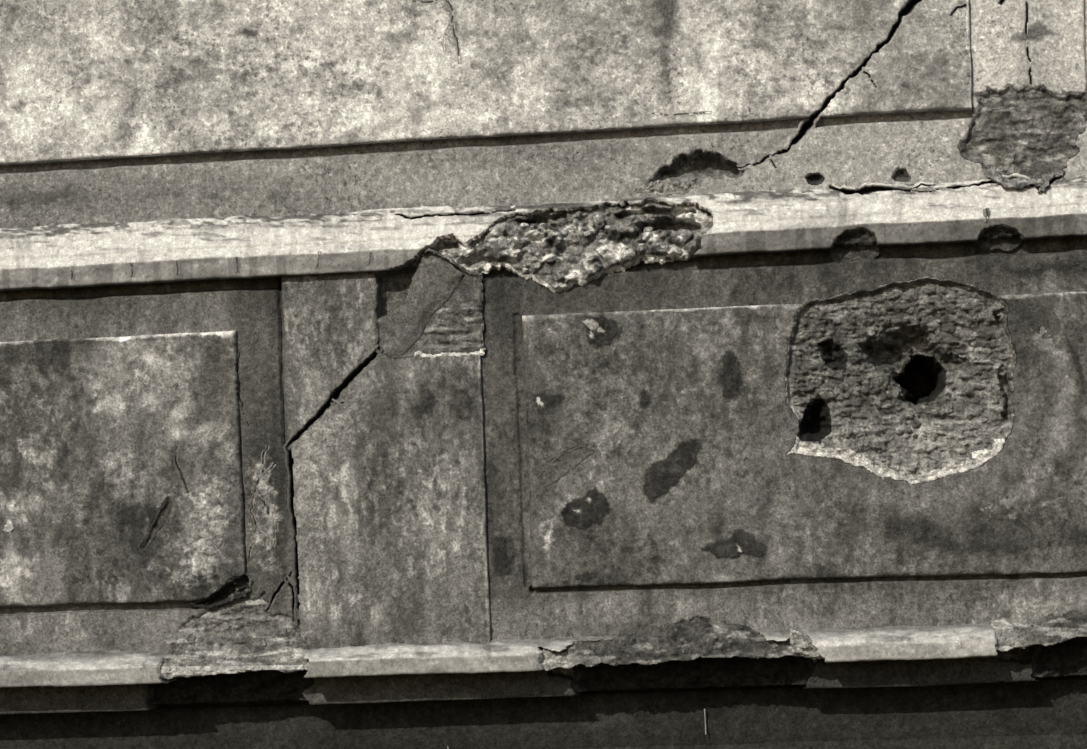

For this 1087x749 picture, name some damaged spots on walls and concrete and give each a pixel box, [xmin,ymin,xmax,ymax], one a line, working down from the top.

crack [950,3,966,17]
crack [1000,0,1033,86]
crack [652,110,712,118]
crack [737,0,924,175]
spalling [958,84,1087,193]
spalling [373,149,745,359]
spalling [818,339,849,370]
spalling [797,394,831,442]
spalling [160,460,309,679]
spalling [540,616,824,677]
spalling [991,611,1087,662]